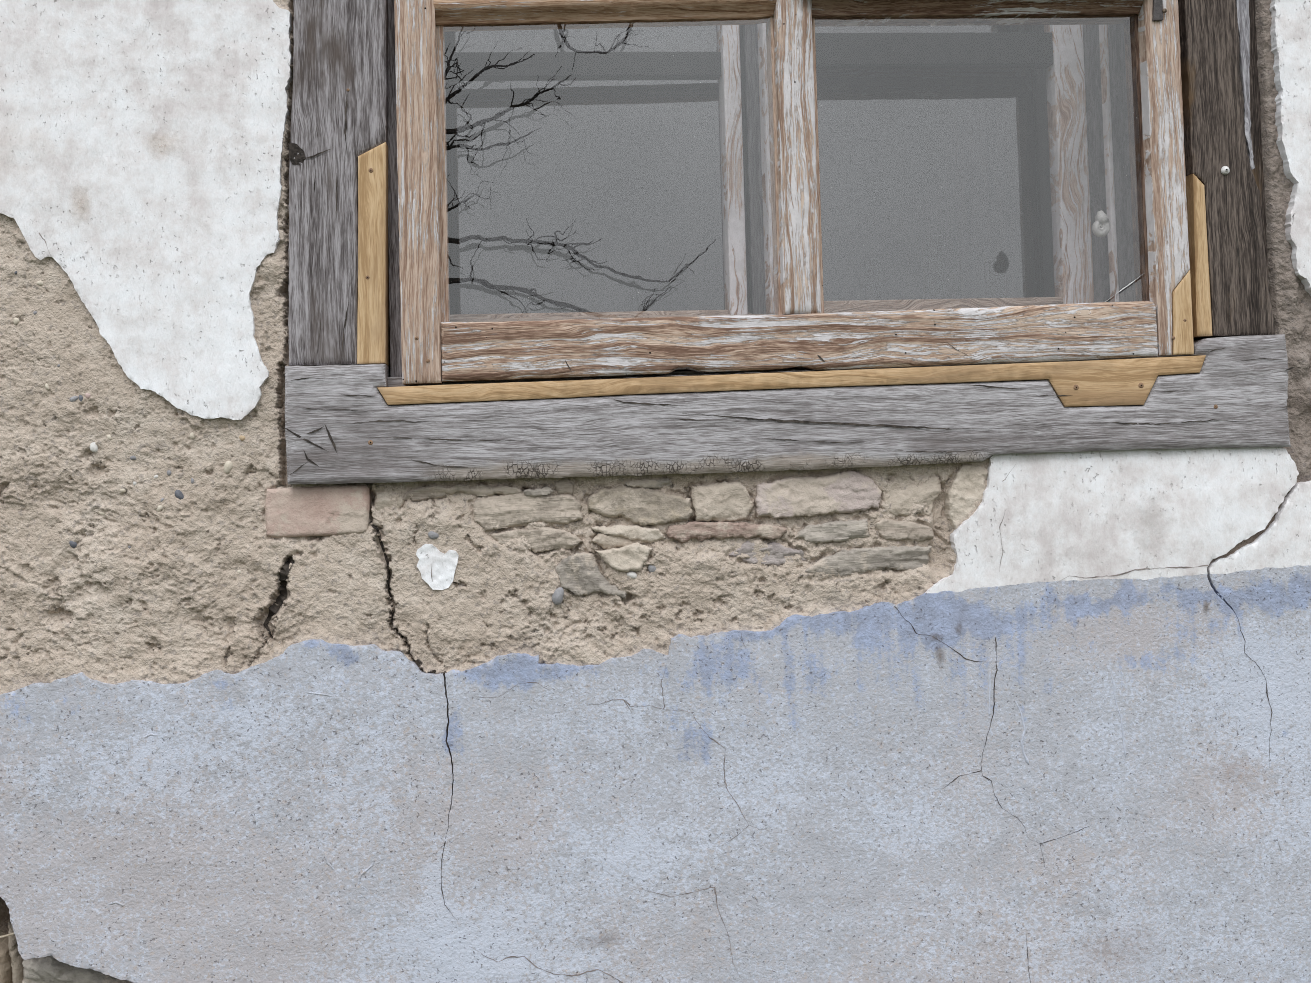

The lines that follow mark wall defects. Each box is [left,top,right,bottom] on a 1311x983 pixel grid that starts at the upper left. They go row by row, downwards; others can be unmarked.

flaking render [1255,0,1311,482]
flaking render [0,0,989,695]
crack [263,558,294,637]
crack [1055,479,1300,593]
crack [369,521,454,917]
crack [481,672,789,846]
crack [894,606,1089,866]
crack [1240,630,1273,763]
spalling [0,897,133,983]
crack [639,887,740,977]